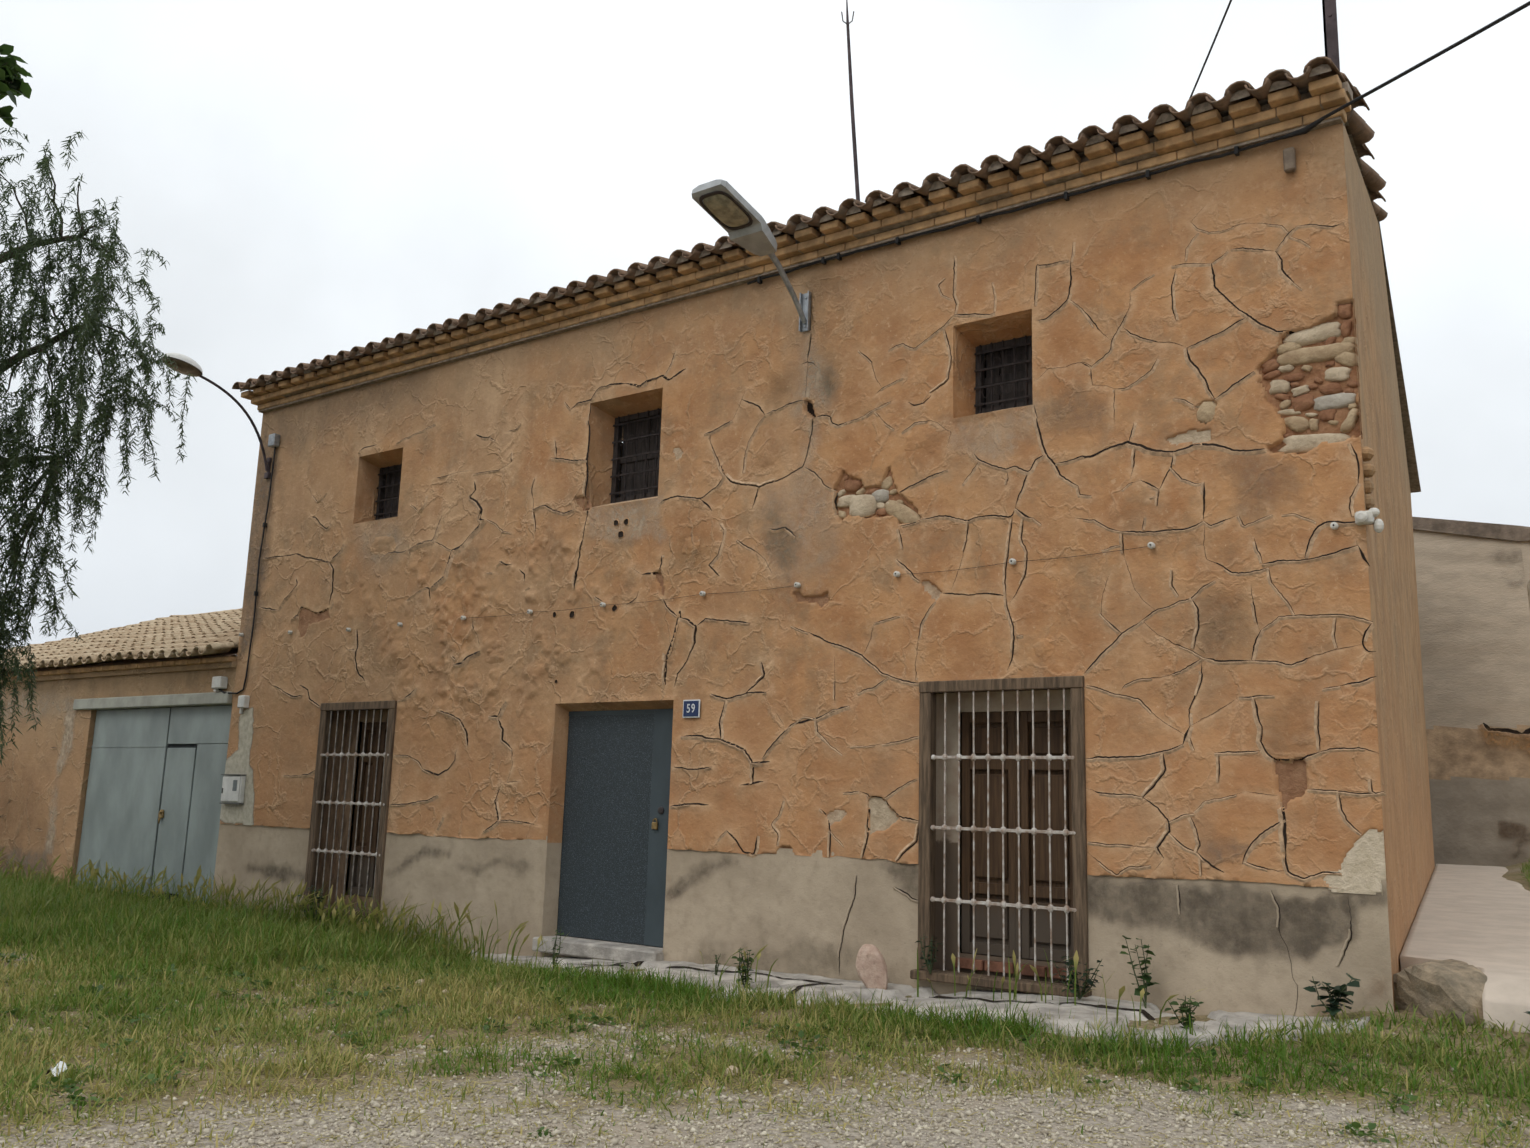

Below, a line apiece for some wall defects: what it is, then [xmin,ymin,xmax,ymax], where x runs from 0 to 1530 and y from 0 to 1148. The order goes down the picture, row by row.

spalling [1259,298,1363,454]
crack [380,351,749,686]
spalling [836,469,921,524]
crack [259,493,364,679]
crack [562,207,1386,1011]
crack [273,685,320,709]
crack [389,688,534,834]
spalling [1275,760,1307,809]
crack [1480,723,1530,740]
peeling [1323,829,1387,895]
damp [1180,889,1348,956]